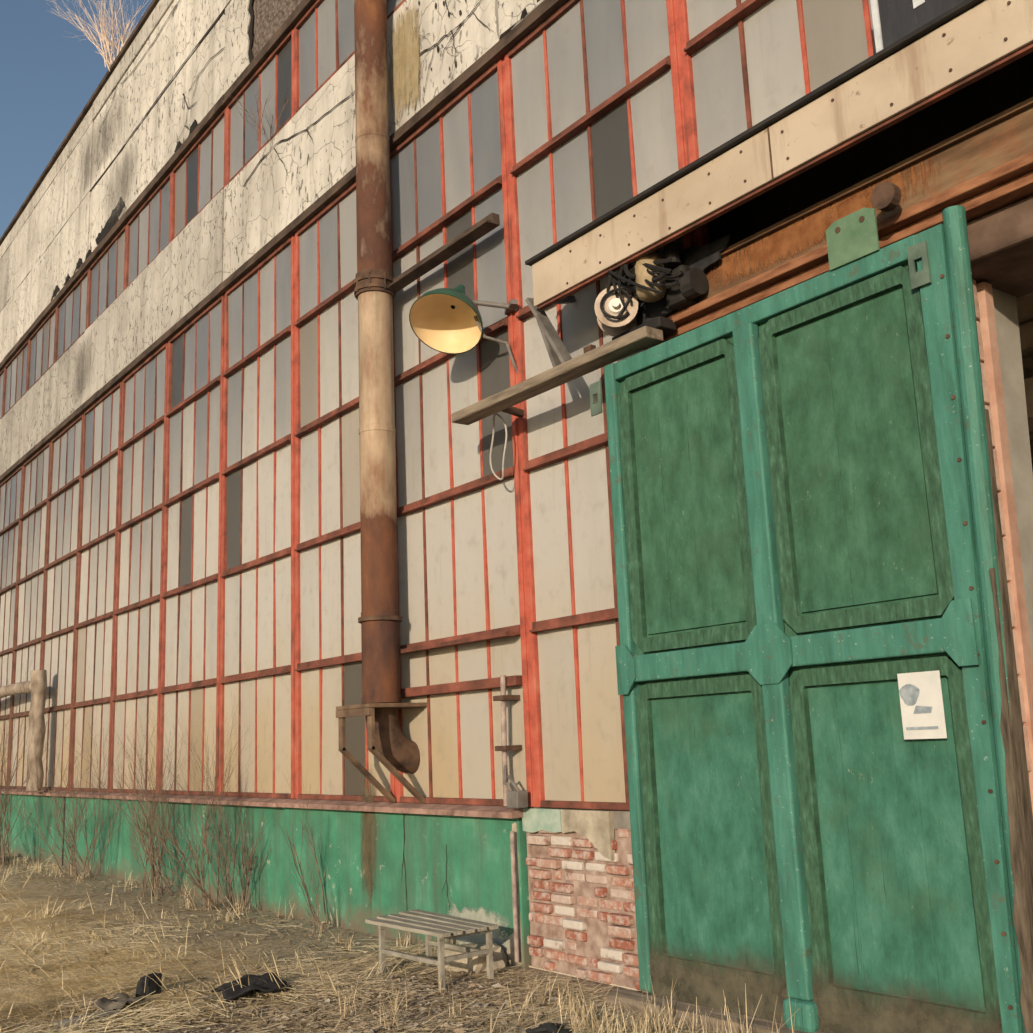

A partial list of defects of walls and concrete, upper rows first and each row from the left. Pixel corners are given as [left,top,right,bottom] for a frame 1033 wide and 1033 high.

crack [50,0,231,244]
crack [243,91,355,187]
crack [418,0,500,98]
spalling [504,808,646,992]